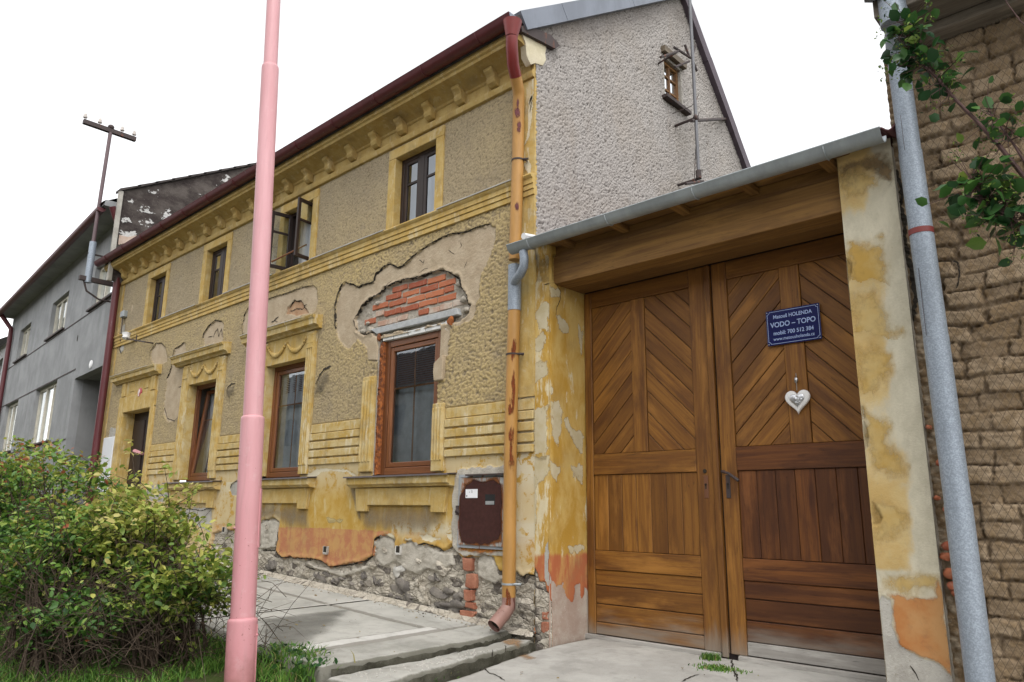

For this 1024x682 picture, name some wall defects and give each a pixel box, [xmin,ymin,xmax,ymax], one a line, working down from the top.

peeling [118,199,171,245]
flaking render [202,320,224,345]
flaking render [267,285,318,327]
flaking render [334,224,496,382]
flaking render [150,342,186,422]
peeling [535,287,584,528]
peeling [385,465,504,617]
peeling [879,596,953,682]